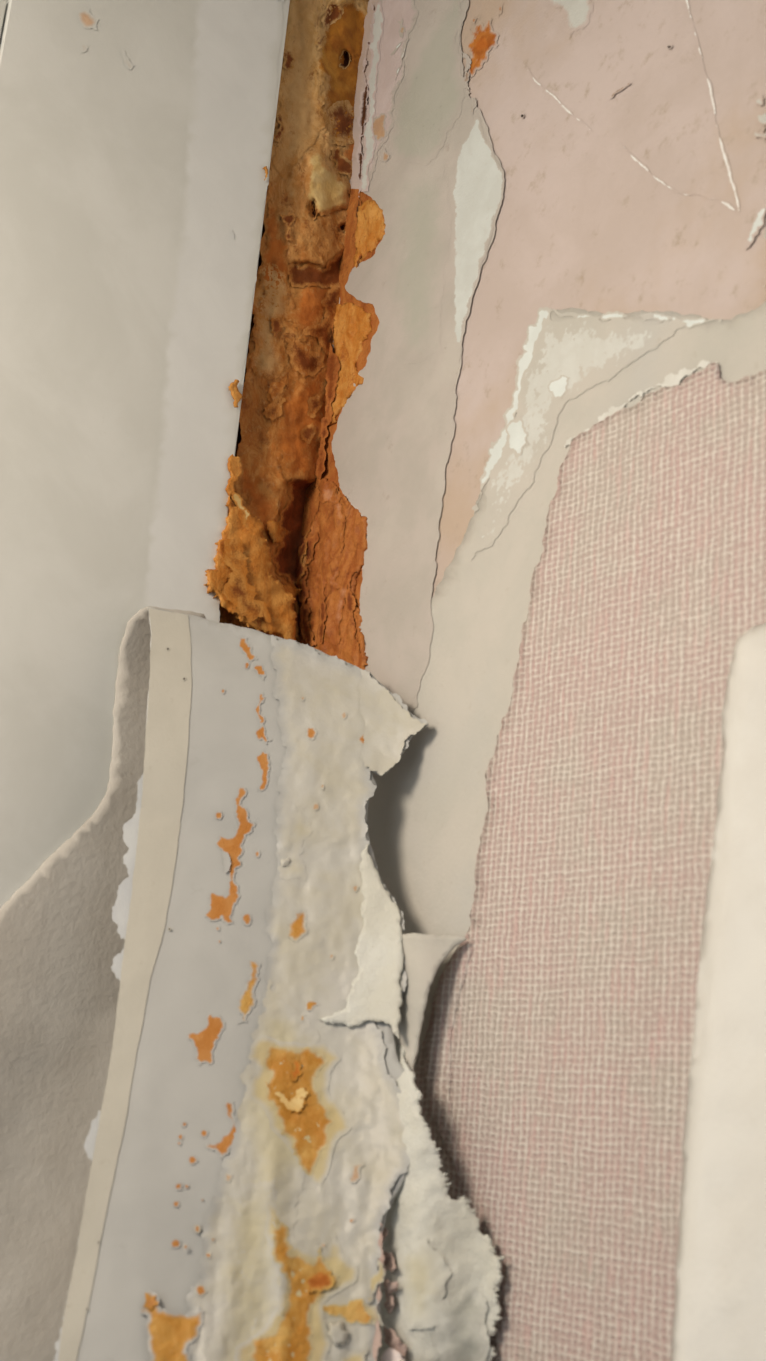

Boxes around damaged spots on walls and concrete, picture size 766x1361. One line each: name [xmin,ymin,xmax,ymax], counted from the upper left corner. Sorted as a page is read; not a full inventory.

rust [466,3,504,77]
peeling [744,198,766,249]